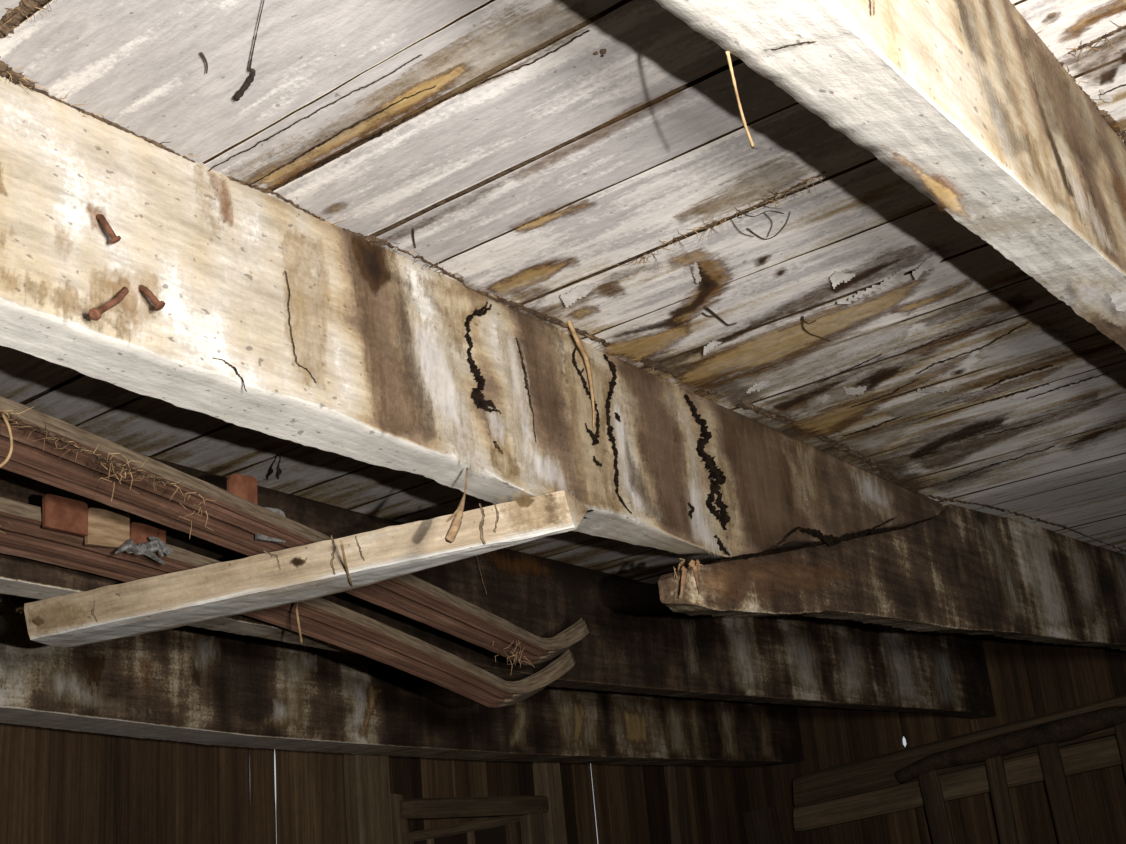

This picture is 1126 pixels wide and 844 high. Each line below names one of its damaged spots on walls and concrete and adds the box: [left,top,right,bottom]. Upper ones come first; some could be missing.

damp [959,0,998,61]
damp [1019,29,1126,196]
damp [1065,0,1126,40]
damp [350,206,463,437]
crack [465,302,502,414]
crack [516,338,537,442]
crack [572,348,632,514]
crack [684,394,932,560]
damp [604,245,1105,544]
damp [1068,417,1126,450]